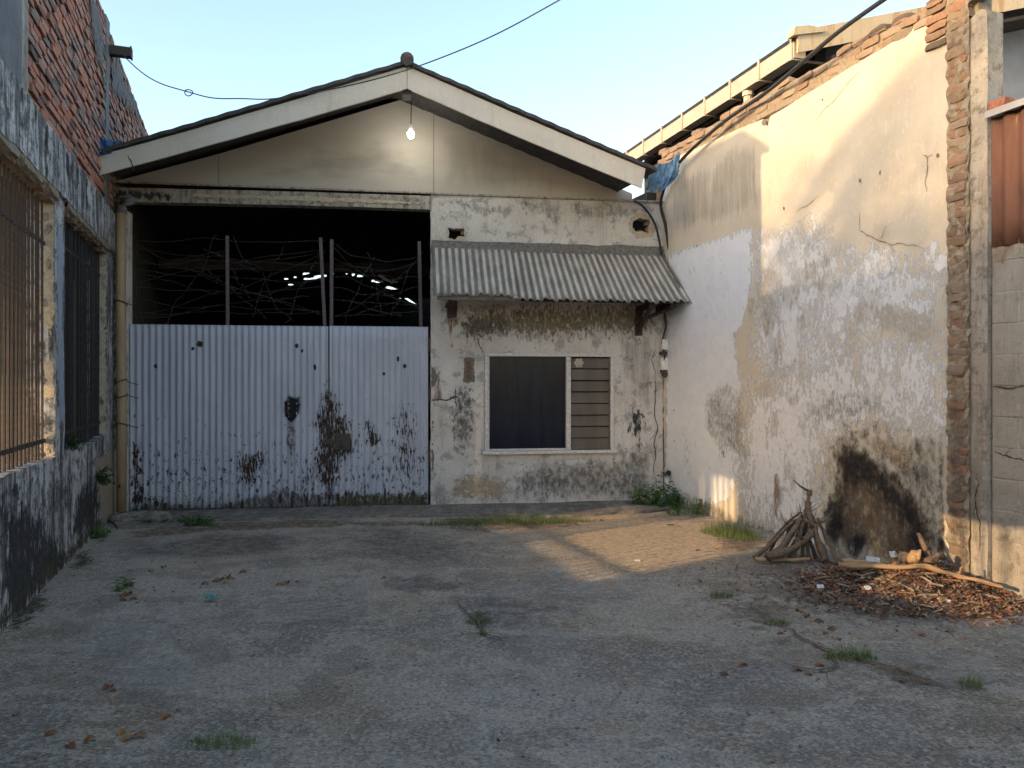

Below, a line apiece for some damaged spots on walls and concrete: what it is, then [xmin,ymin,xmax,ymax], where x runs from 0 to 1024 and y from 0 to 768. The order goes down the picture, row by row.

crack [859,212,926,251]
peeling [664,0,975,571]
corrosion [129,441,147,506]
corrosion [236,450,267,490]
corrosion [295,377,424,506]
leakage [452,388,475,455]
leakage [452,407,647,500]
leakage [1,463,99,625]